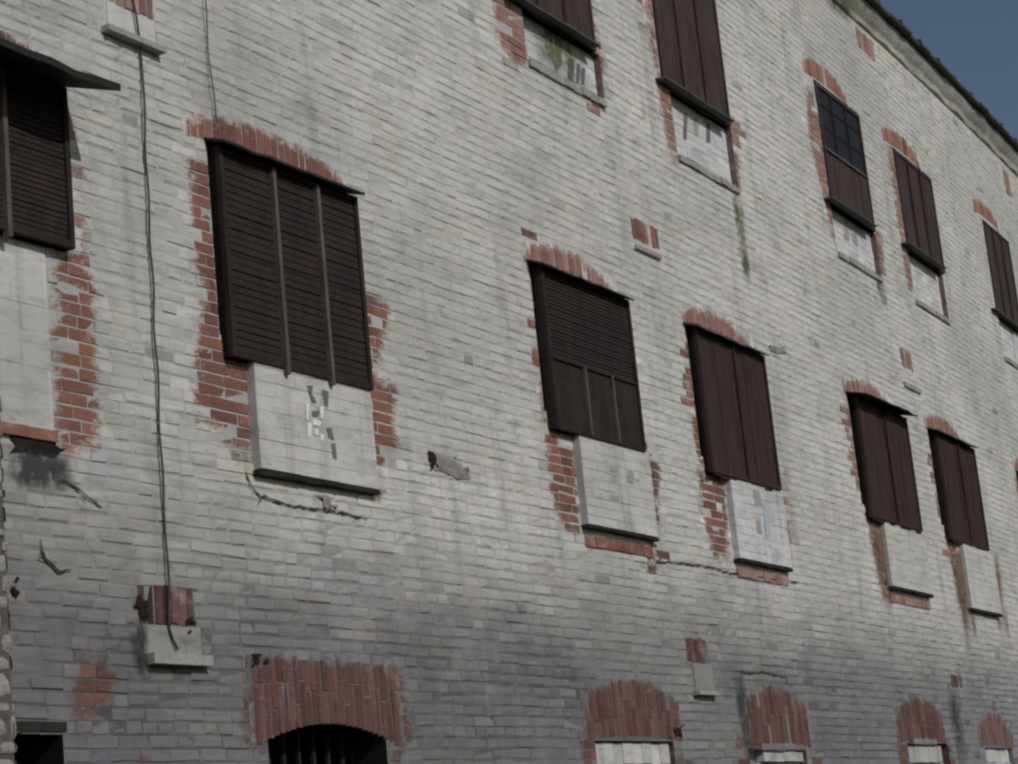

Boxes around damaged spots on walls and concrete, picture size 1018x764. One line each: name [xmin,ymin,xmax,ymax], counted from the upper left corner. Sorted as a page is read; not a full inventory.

peeling [488,0,538,82]
damp [735,203,750,274]
peeling [11,103,123,477]
peeling [170,138,254,475]
damp [13,450,70,488]
peeling [839,405,860,491]
peeling [859,512,898,609]